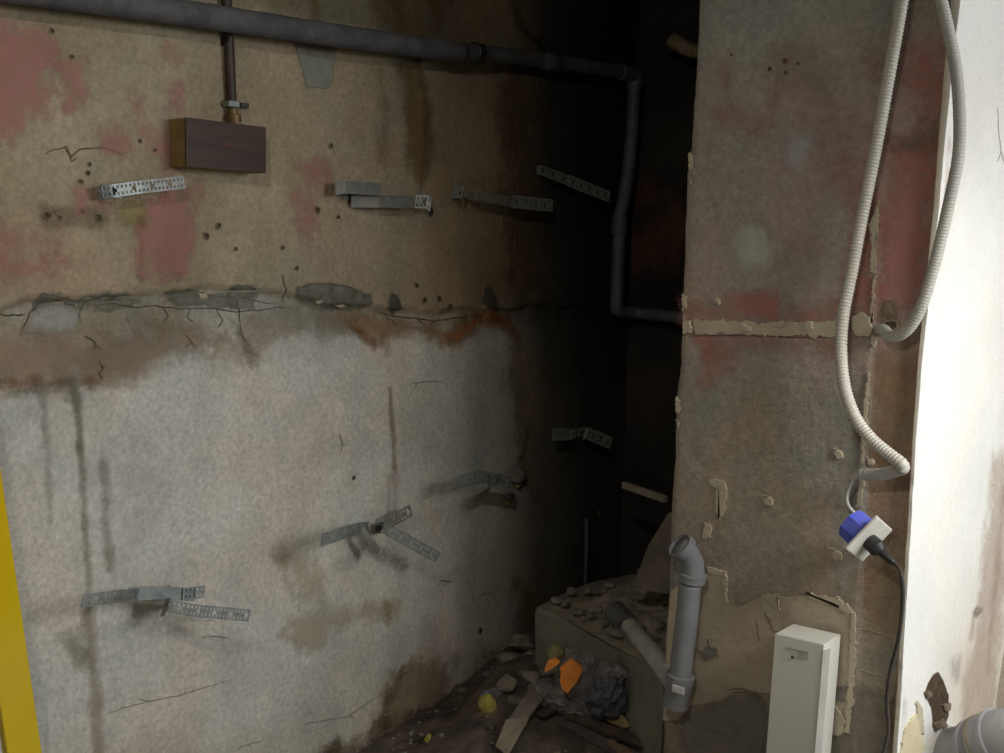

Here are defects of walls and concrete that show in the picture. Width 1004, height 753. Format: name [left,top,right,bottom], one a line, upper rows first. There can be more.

crack [45,146,124,161]
spalling [32,292,137,313]
spalling [165,285,280,309]
spalling [297,283,372,311]
spalling [387,293,402,313]
crack [0,275,295,379]
leakage [0,328,210,489]
peeling [804,591,952,753]